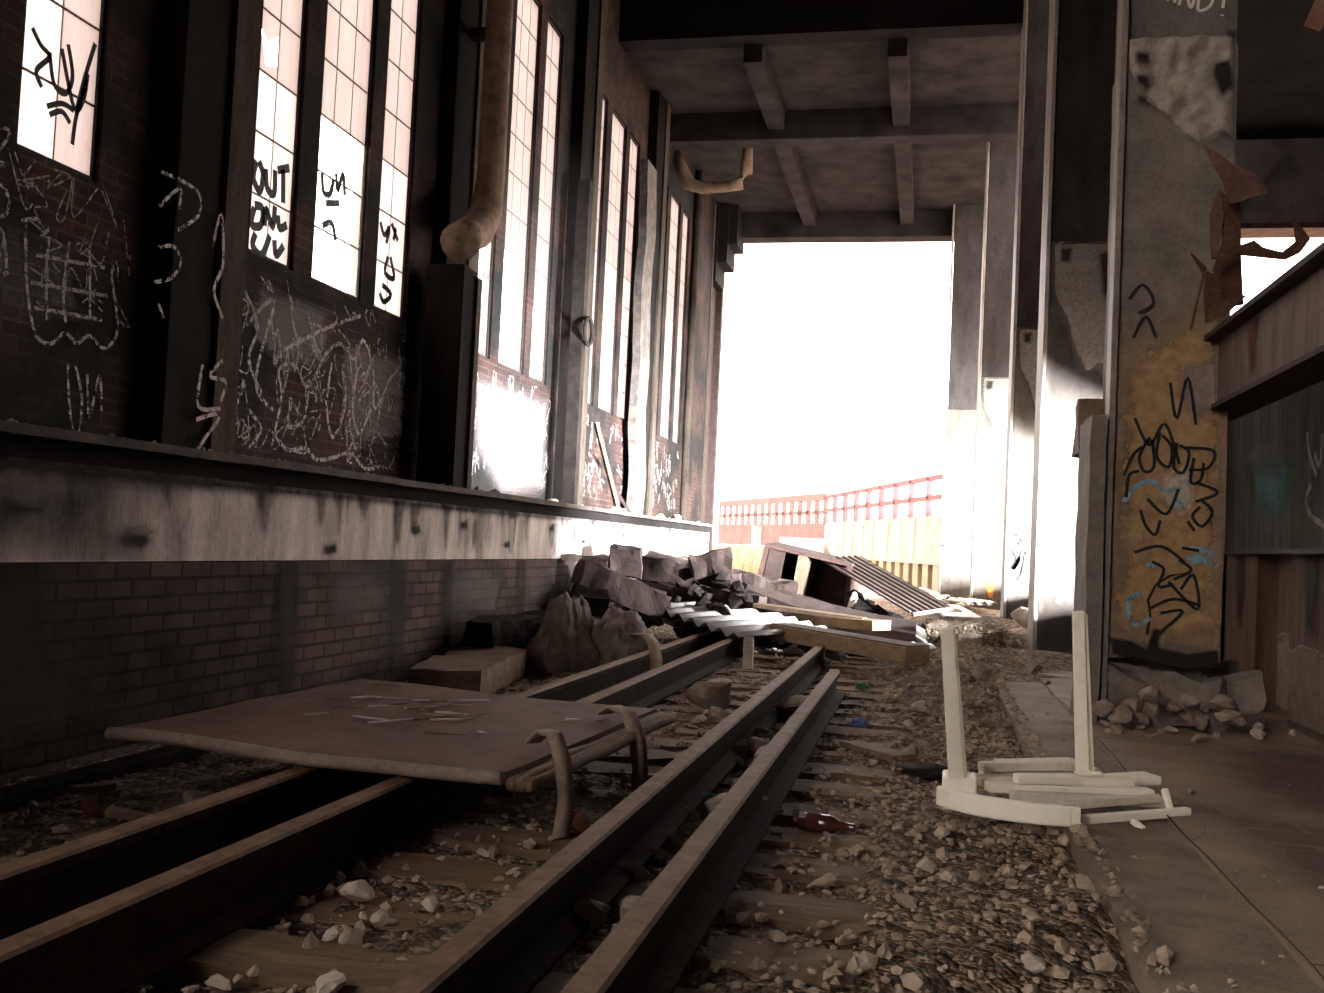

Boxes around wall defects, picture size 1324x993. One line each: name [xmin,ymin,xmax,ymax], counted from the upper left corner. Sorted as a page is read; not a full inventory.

spalling [1129,31,1236,144]
leakage [0,456,708,614]
leakage [0,562,225,774]
leakage [390,561,406,672]